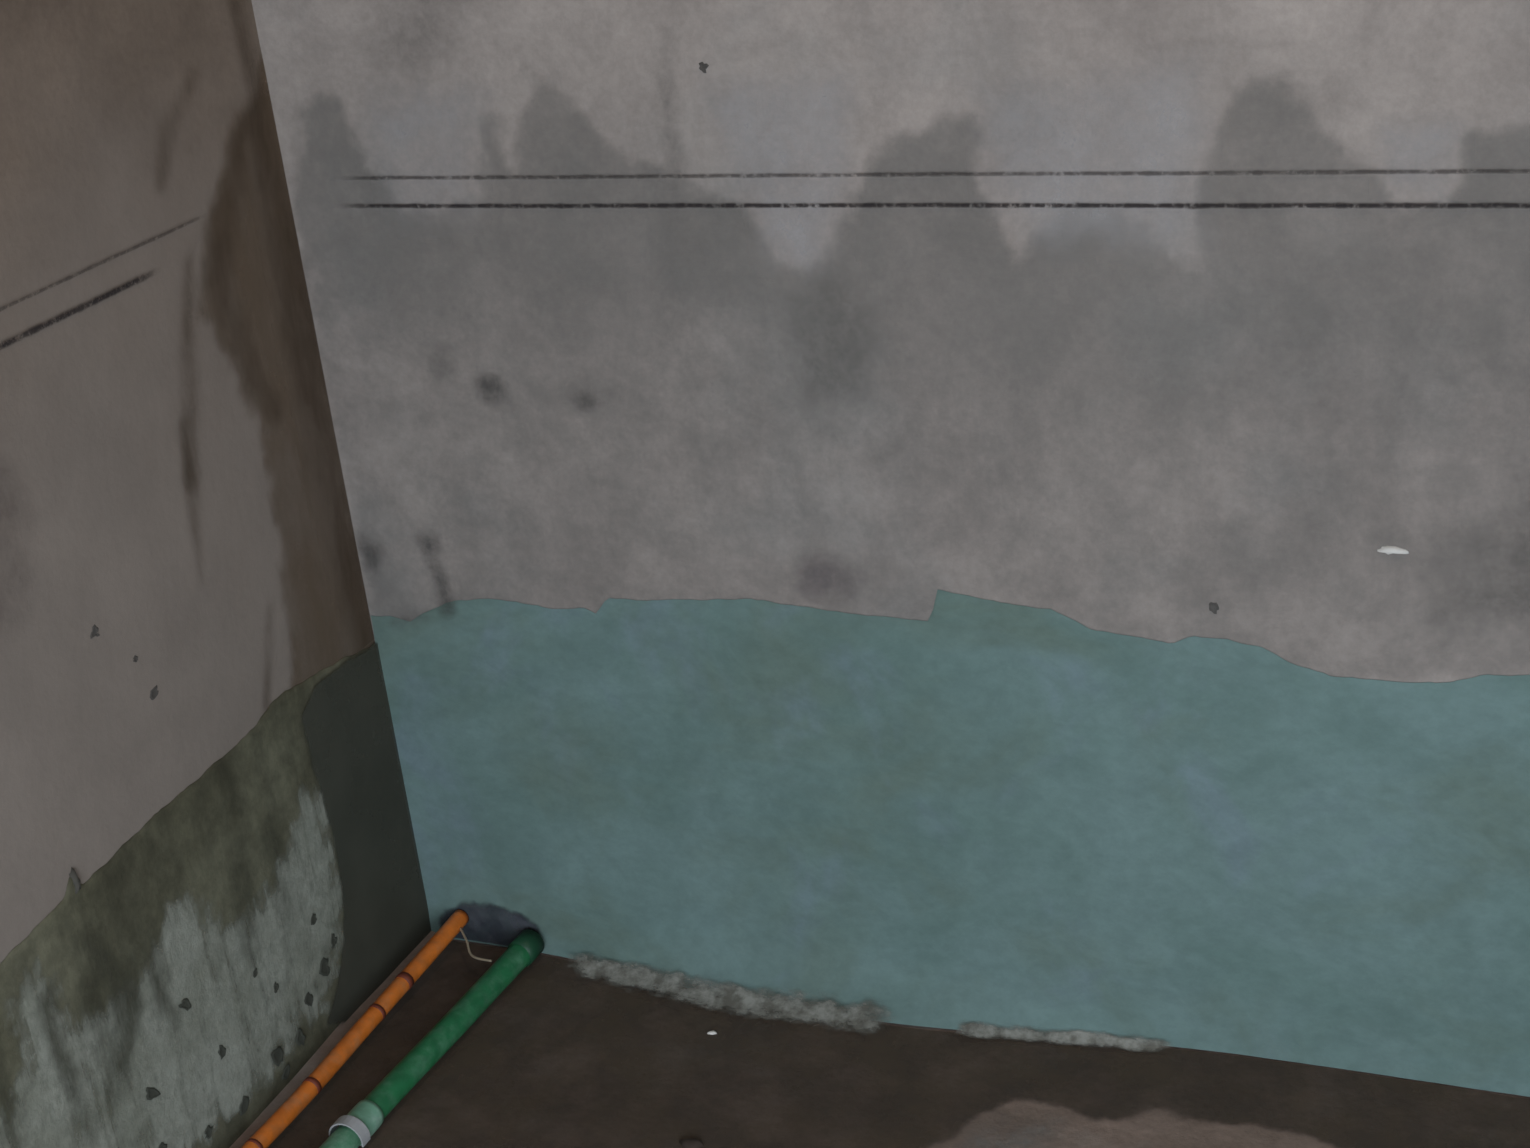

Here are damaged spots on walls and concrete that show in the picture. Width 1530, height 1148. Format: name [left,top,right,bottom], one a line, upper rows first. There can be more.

leakage [212,62,312,492]
leakage [0,539,431,1148]
leakage [268,940,507,1148]
leakage [358,954,1530,1148]